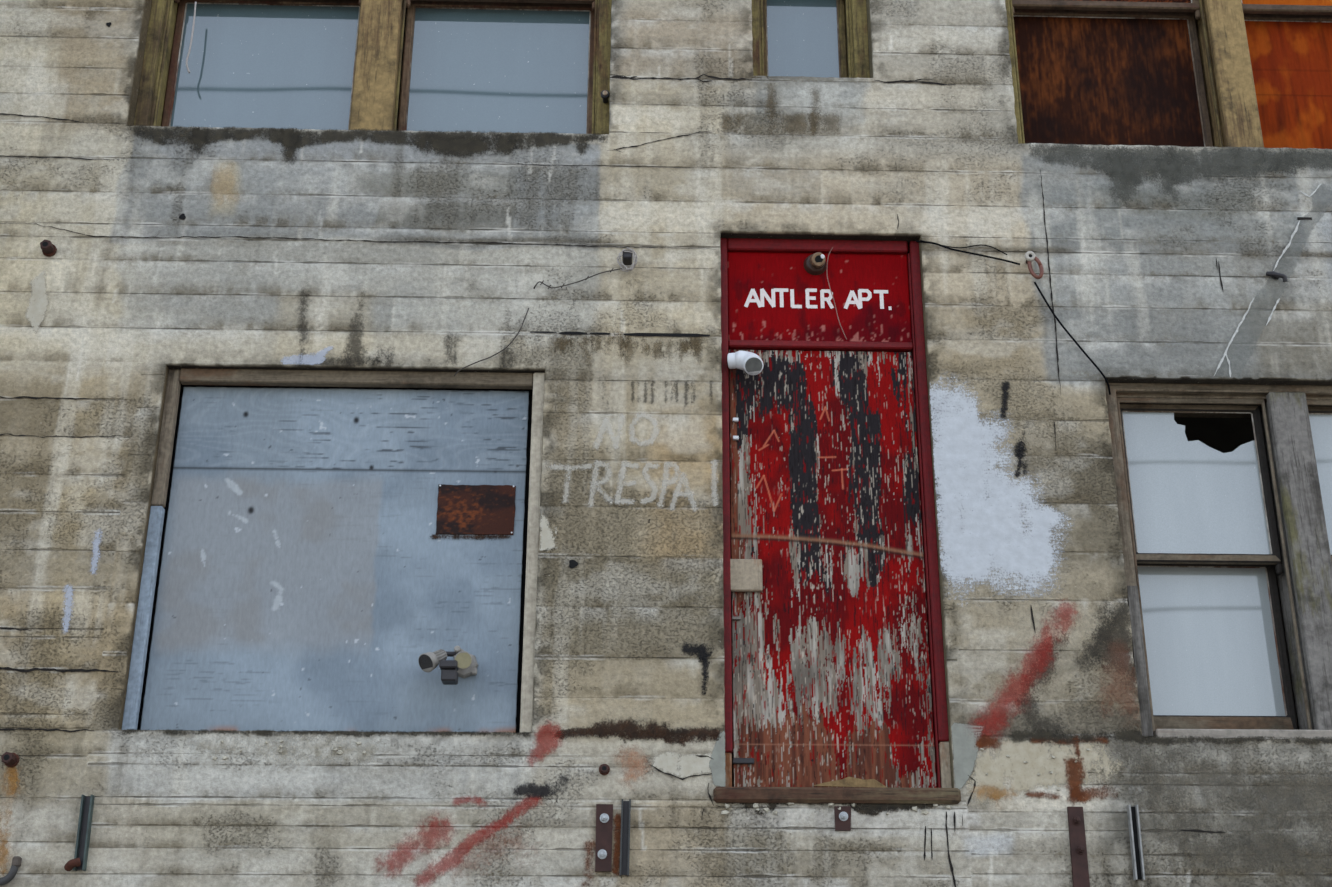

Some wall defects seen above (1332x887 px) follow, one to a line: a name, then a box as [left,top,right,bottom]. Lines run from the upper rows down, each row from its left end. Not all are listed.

leakage [130,125,608,162]
leakage [1028,143,1332,203]
crack [0,726,94,734]